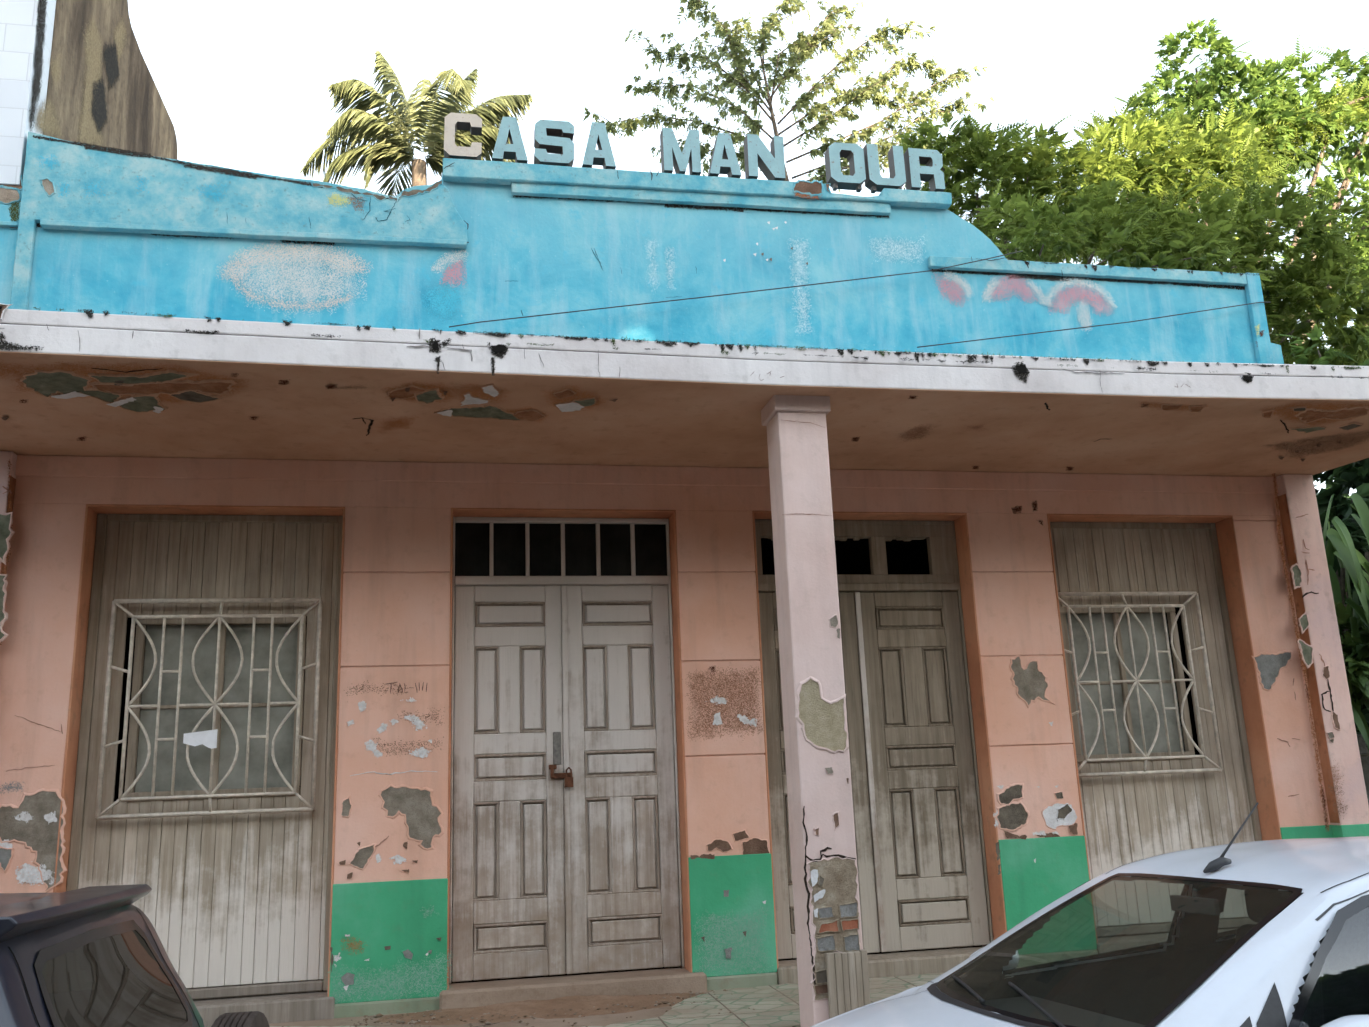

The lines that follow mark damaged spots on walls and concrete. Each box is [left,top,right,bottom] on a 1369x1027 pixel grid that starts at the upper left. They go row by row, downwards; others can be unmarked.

spalling [9,361,250,413]
spalling [1258,401,1369,434]
flaking render [0,512,15,642]
peeling [705,695,757,727]
flaking render [795,676,849,783]
flaking render [1009,655,1055,708]
flaking render [1252,611,1341,743]
flaking render [0,788,67,893]
flaking render [339,784,444,879]
peeling [691,829,770,859]
flaking render [993,783,1078,875]
flaking render [806,856,861,1001]